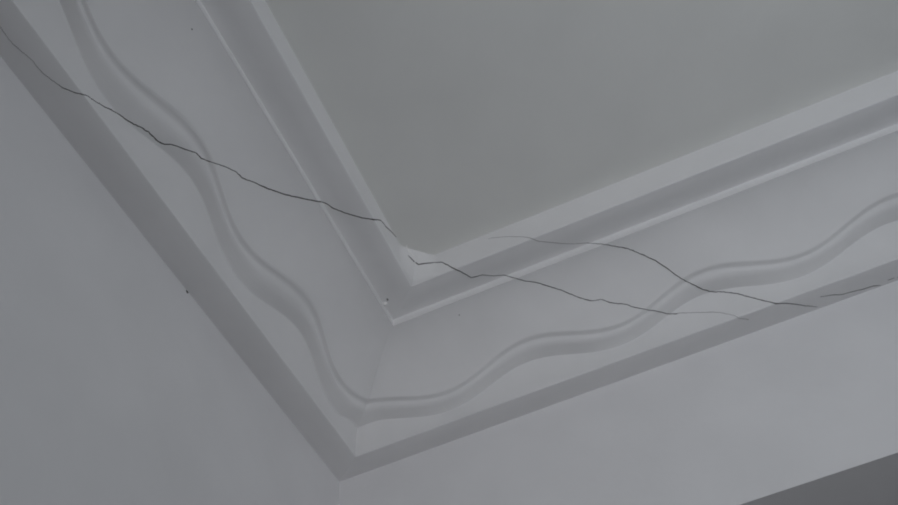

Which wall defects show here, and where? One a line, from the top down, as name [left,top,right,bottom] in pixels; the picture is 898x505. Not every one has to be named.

crack [0,27,893,320]